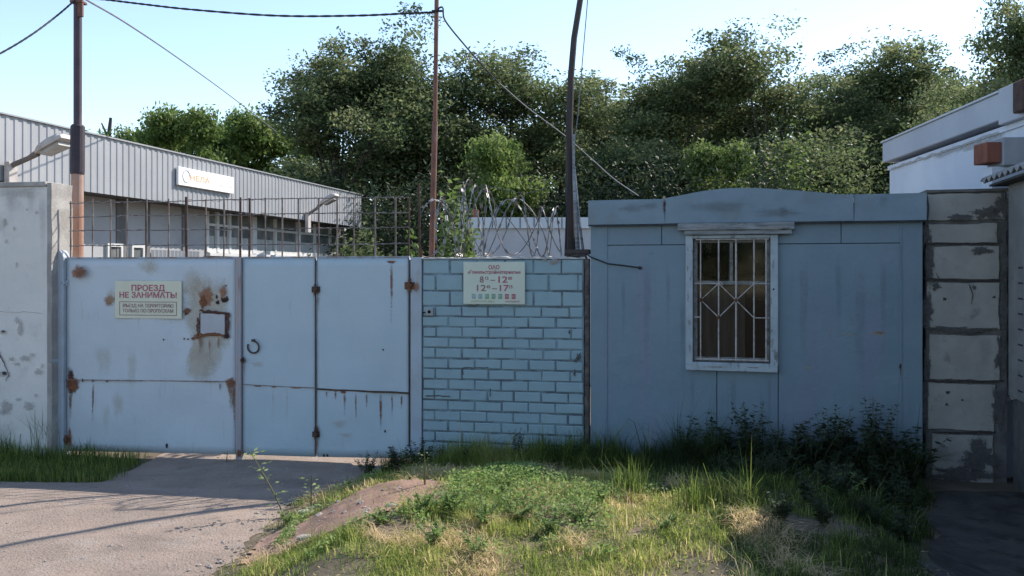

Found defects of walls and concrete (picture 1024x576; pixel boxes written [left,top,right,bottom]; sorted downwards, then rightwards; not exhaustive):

rust [72,265,86,278]
rust [183,286,230,349]
rust [67,369,108,411]
rust [219,357,245,417]